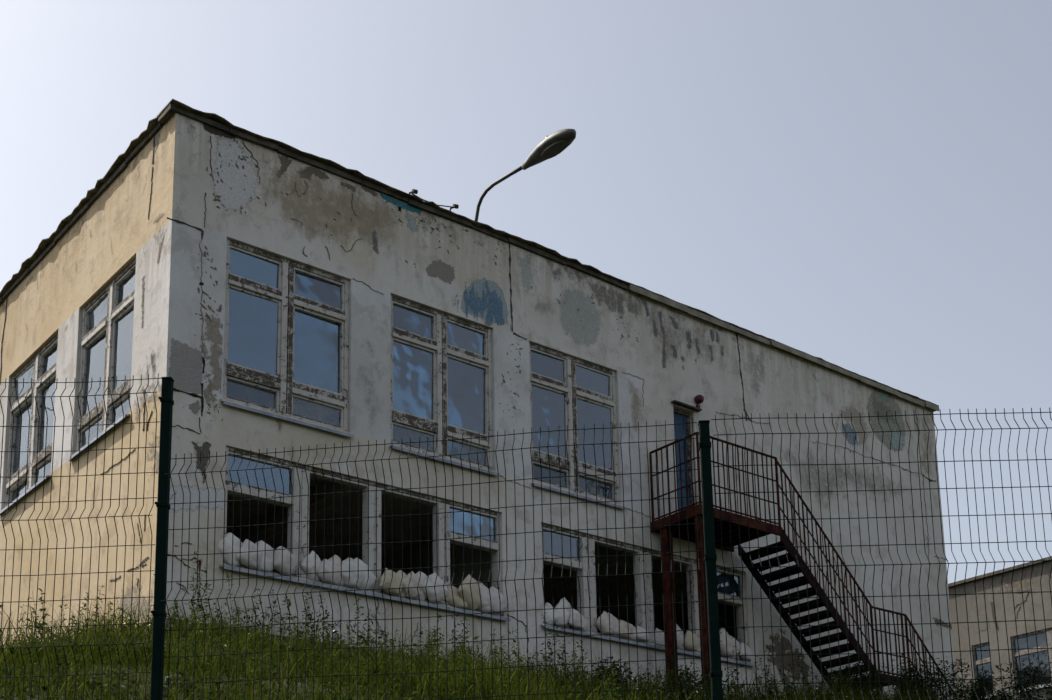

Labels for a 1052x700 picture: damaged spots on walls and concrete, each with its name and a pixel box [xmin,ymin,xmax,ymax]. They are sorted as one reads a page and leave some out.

spalling [202,123,267,215]
spalling [276,154,329,181]
spalling [341,182,475,285]
crack [101,135,212,474]
spalling [132,246,225,421]
water stain [547,259,724,369]
crack [716,334,768,424]
crack [812,407,947,565]